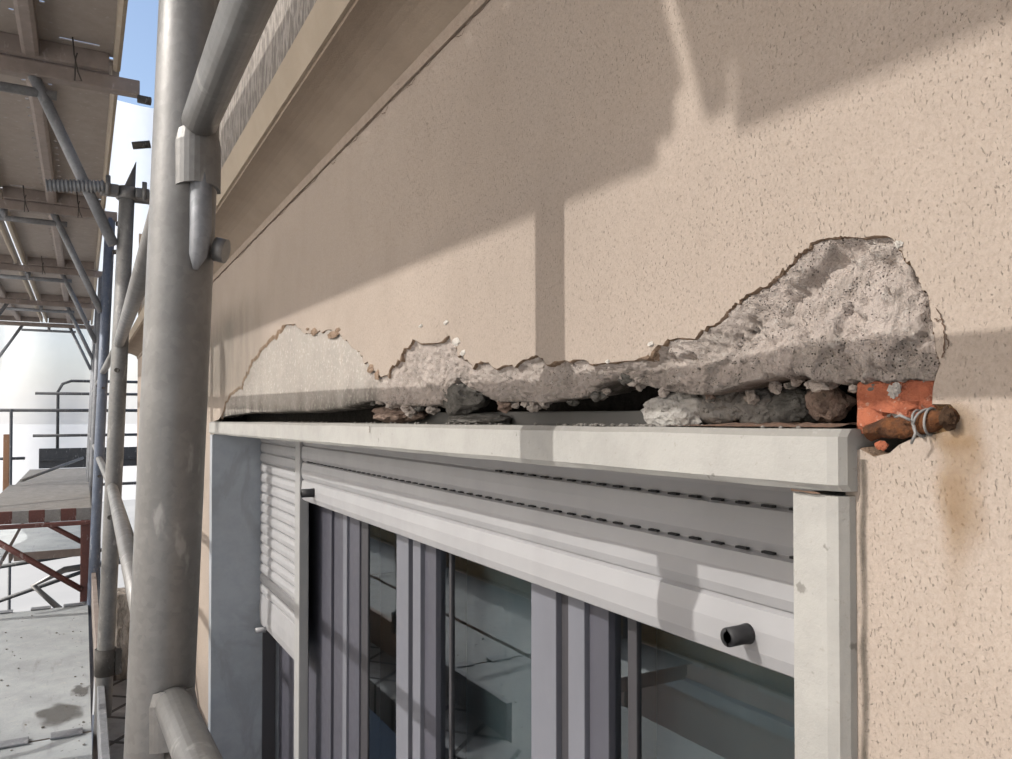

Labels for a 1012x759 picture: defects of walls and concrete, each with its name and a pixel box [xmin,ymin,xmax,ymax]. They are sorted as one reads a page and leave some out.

spalling [221,235,960,457]
rust [863,406,960,444]